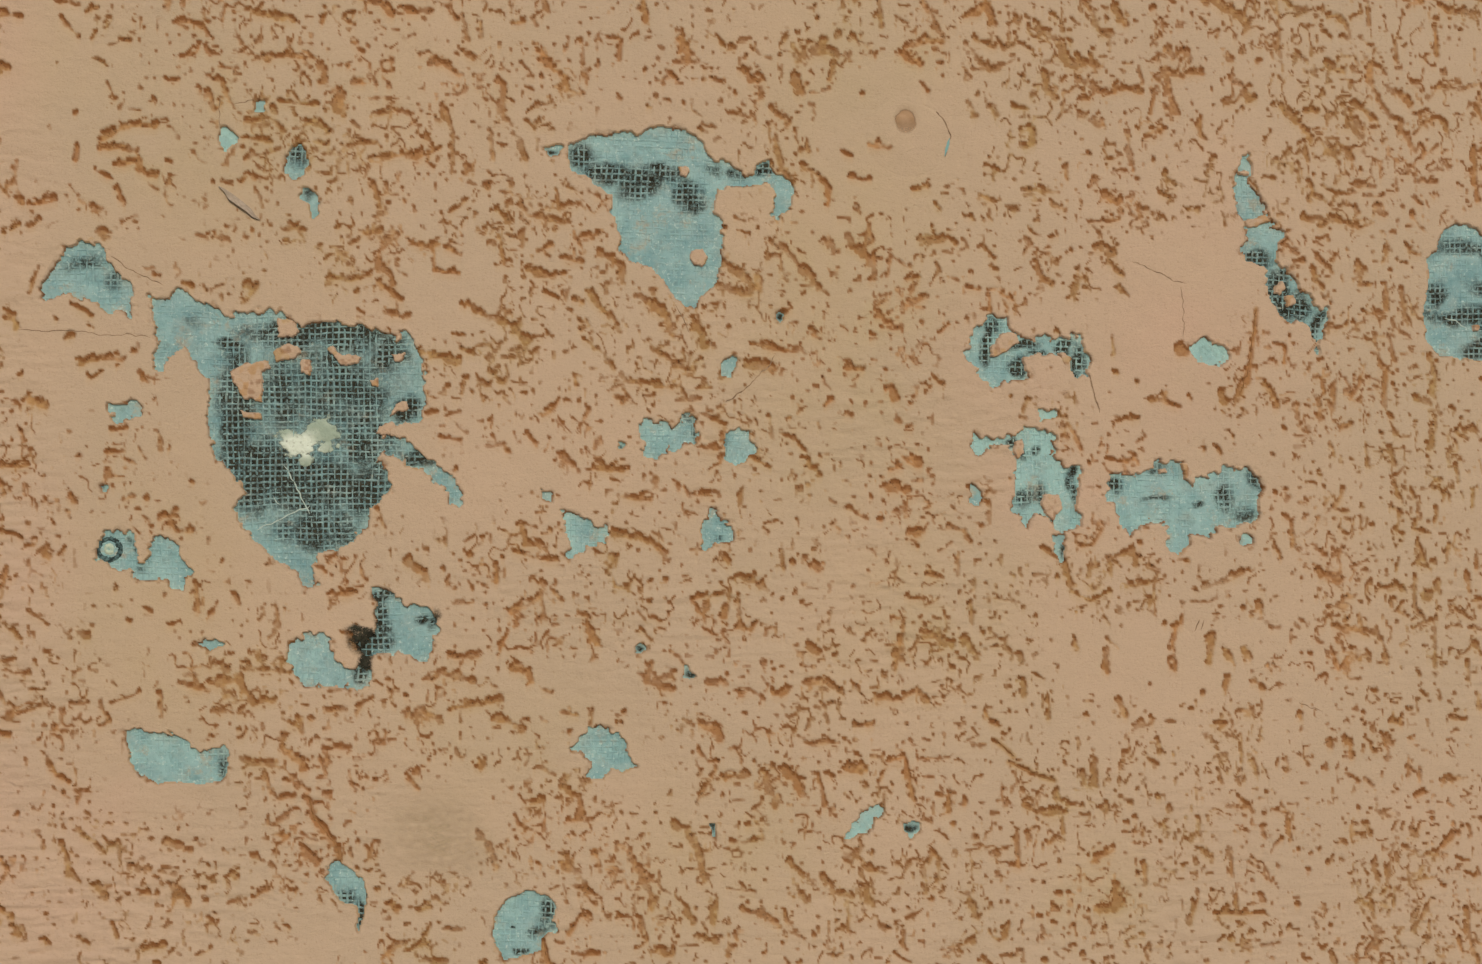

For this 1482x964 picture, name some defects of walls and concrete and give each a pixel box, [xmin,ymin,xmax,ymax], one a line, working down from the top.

peeling [544,126,794,309]
peeling [1232,153,1328,355]
peeling [1423,224,1482,361]
peeling [963,314,1091,388]
peeling [41,240,463,591]
peeling [969,409,1082,563]
peeling [1105,459,1262,555]
peeling [286,587,440,691]
peeling [126,728,230,785]
peeling [570,725,637,779]
peeling [325,861,367,931]
peeling [493,890,558,960]